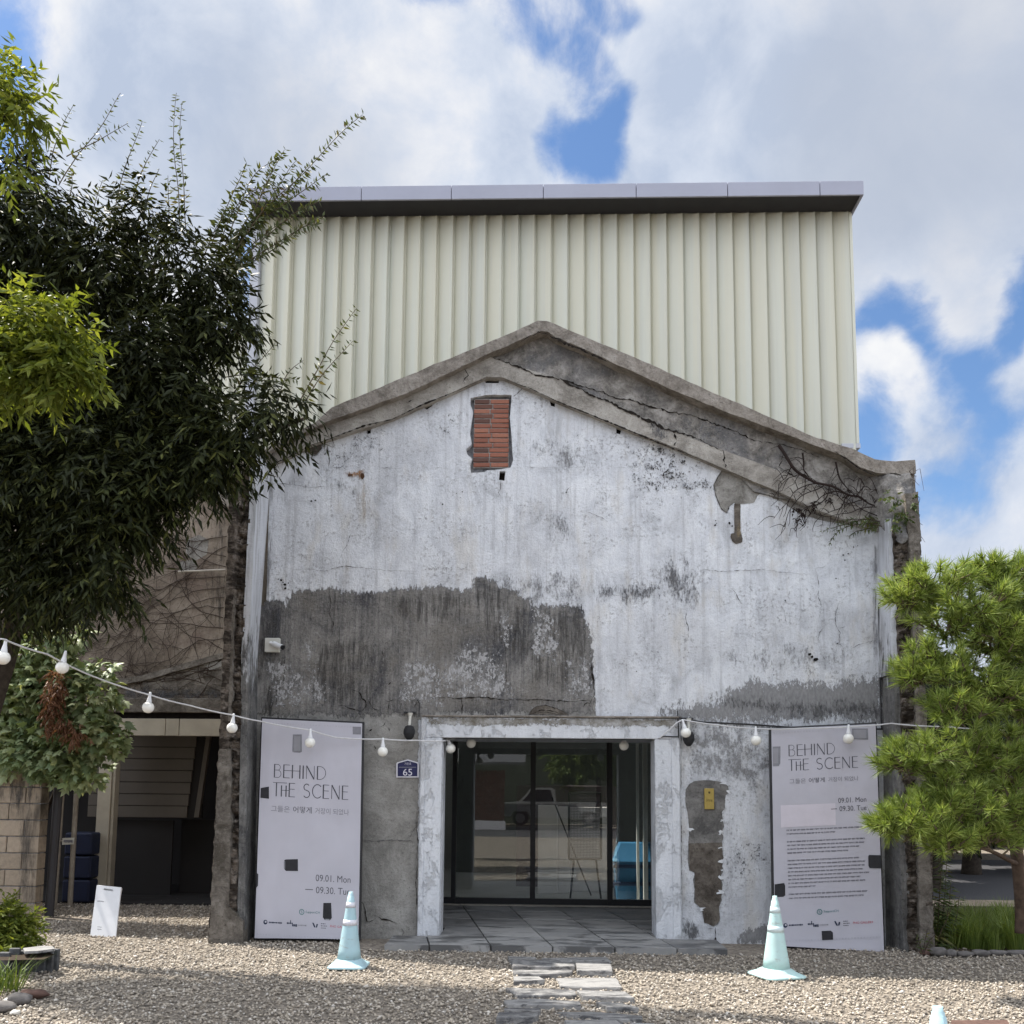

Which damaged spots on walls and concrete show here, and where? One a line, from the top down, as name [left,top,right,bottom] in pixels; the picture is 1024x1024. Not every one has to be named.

crack [275,331,911,488]
water stain [626,424,718,504]
spalling [713,471,850,544]
water stain [660,672,883,728]
peeling [685,725,770,926]